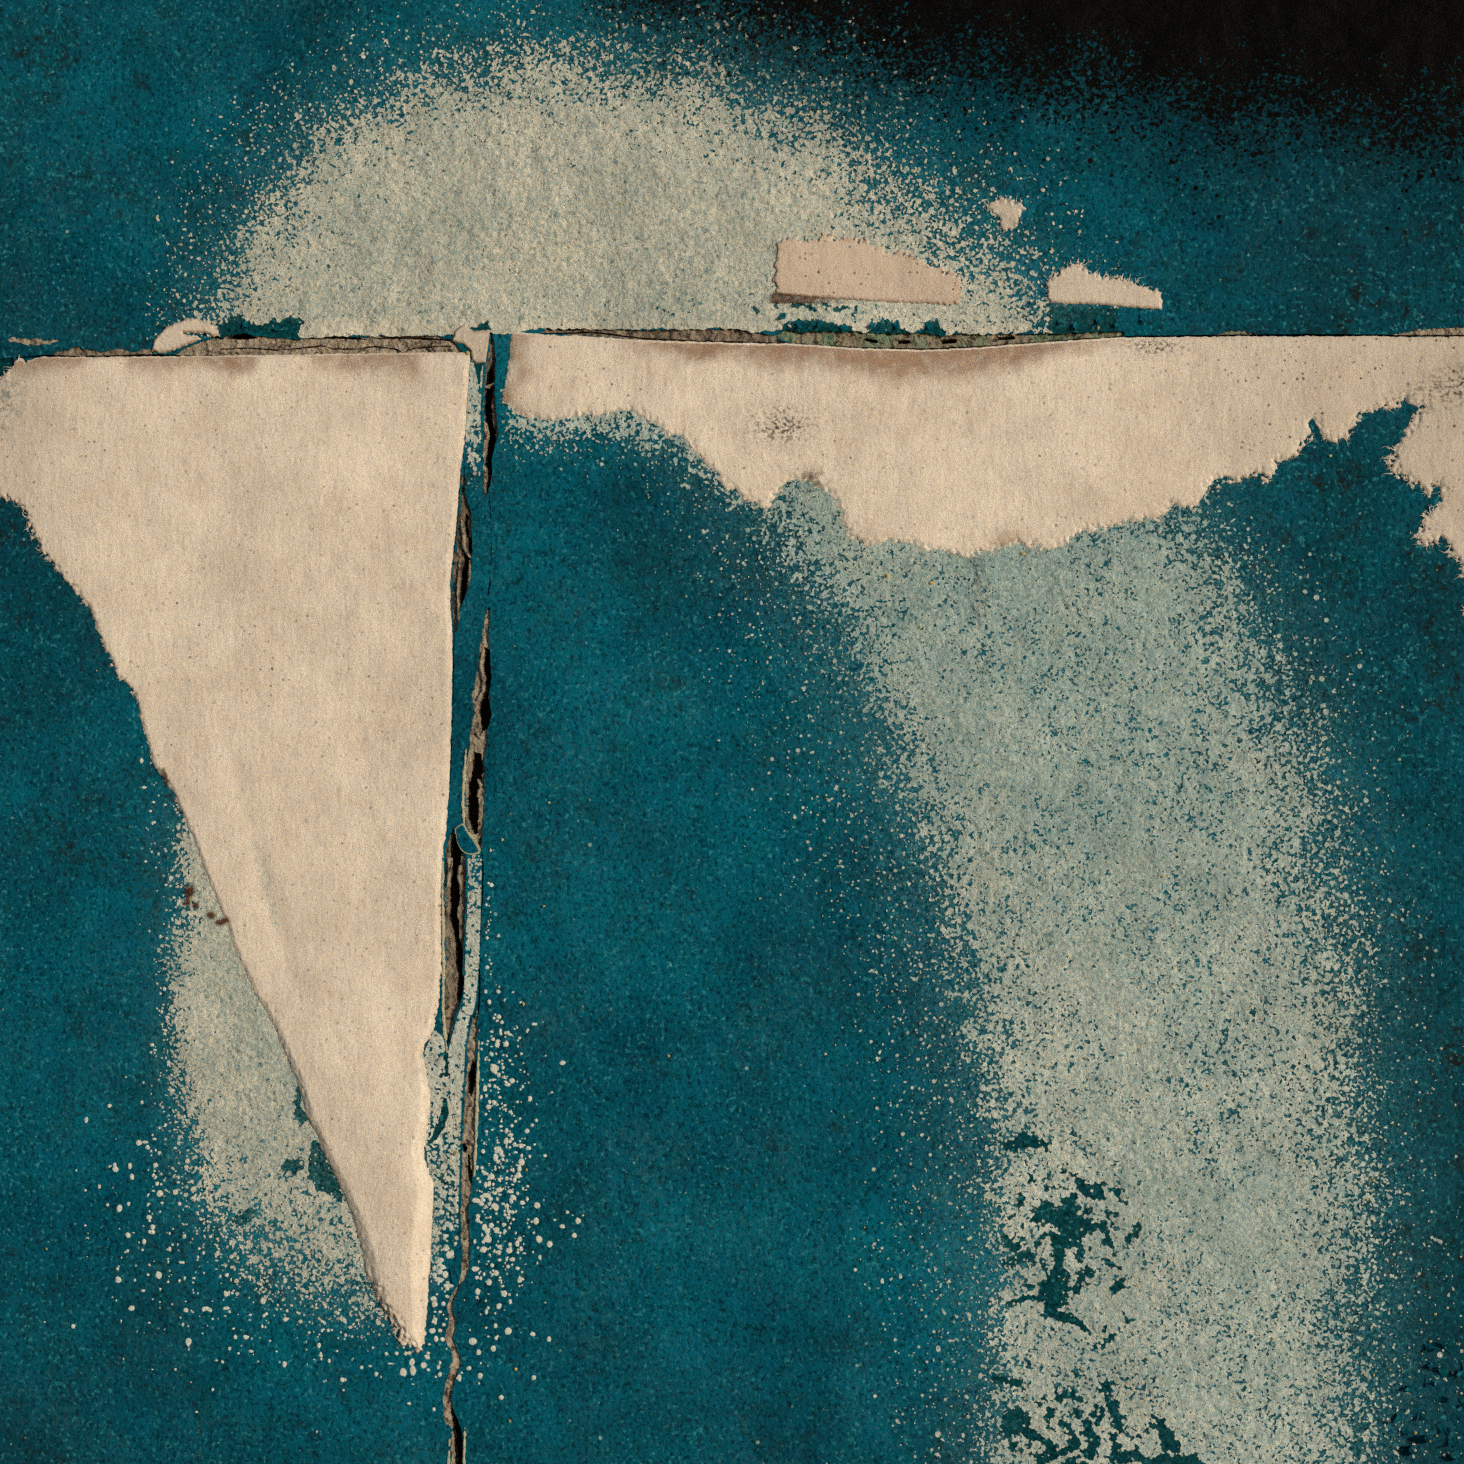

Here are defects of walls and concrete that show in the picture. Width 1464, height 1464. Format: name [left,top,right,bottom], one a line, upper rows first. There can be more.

crack [542,313,1146,350]
peeling [502,232,1464,579]
crack [1210,329,1255,337]
crack [1393,327,1464,338]
peeling [0,313,492,1357]
crack [7,320,499,1464]
peeling [996,1128,1142,1350]
peeling [1393,1342,1464,1462]